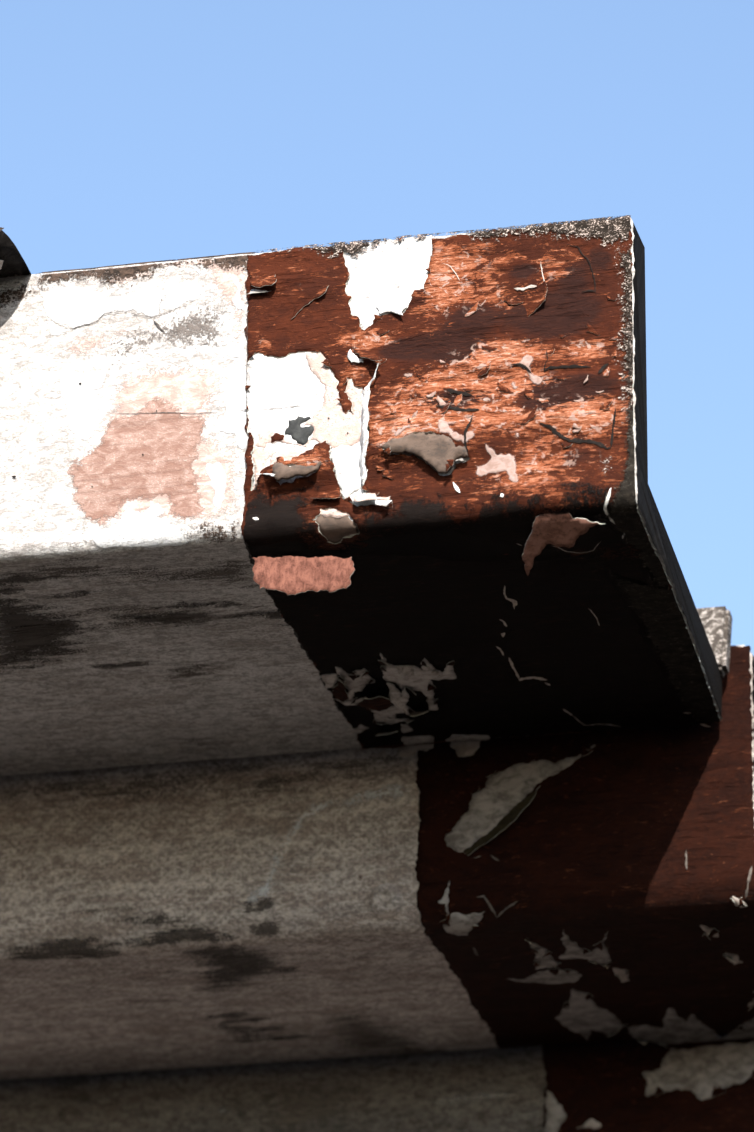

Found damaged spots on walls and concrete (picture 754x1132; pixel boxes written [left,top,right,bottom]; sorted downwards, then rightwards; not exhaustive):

crack [54,299,200,332]
peeling [46,256,269,340]
peeling [345,235,433,335]
peeling [390,372,473,423]
peeling [478,345,549,425]
peeling [66,348,394,544]
peeling [321,653,490,759]
peeling [444,744,596,856]
peeling [436,881,485,936]
peeling [730,896,748,908]
peeling [509,931,754,1100]
peeling [544,1090,602,1132]